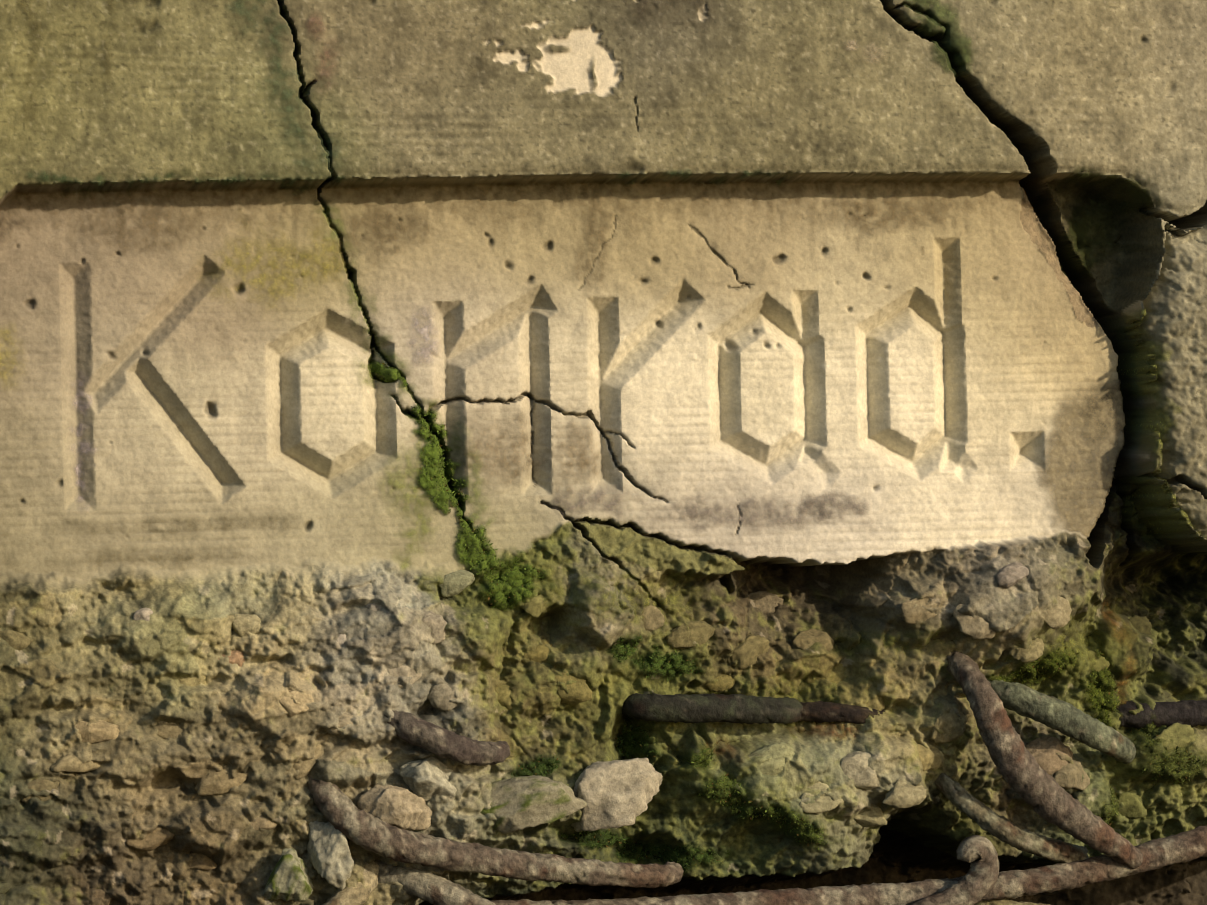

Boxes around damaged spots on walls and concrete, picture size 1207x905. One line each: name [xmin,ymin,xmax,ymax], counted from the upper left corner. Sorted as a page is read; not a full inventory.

crack [277,0,743,611]
peeling [483,19,624,99]
peeling [698,4,711,24]
crack [689,224,755,291]
crack [880,0,1067,253]
crack [1069,274,1207,570]
crack [1139,200,1207,232]
spalling [0,476,1207,905]